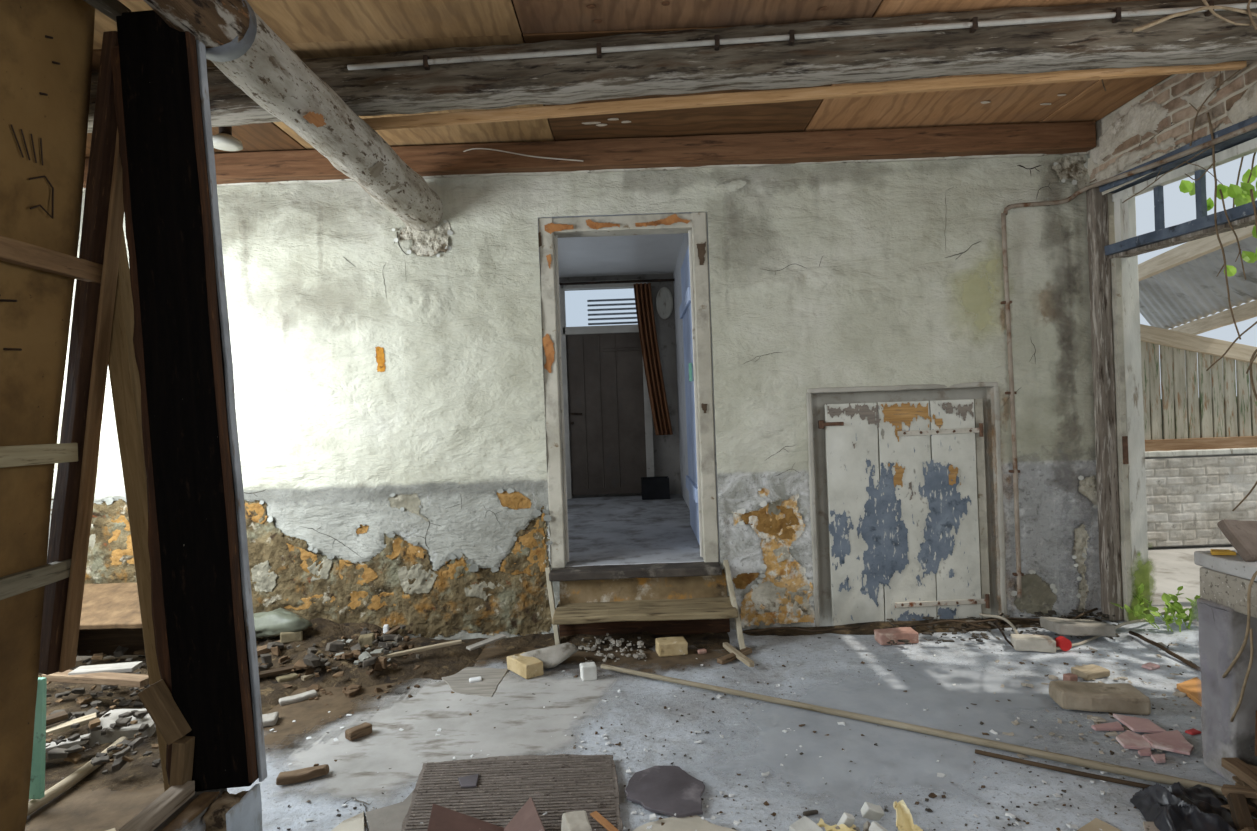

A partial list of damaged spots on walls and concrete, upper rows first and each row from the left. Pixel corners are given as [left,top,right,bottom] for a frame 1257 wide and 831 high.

flaking render [1051,60,1257,190]
peeling [538,219,620,268]
peeling [635,214,690,227]
peeling [542,334,555,373]
peeling [826,402,974,442]
peeling [85,497,137,584]
peeling [244,488,553,638]
peeling [732,488,815,627]
peeling [829,459,971,607]
peeling [897,605,960,621]
crack [344,797,373,831]